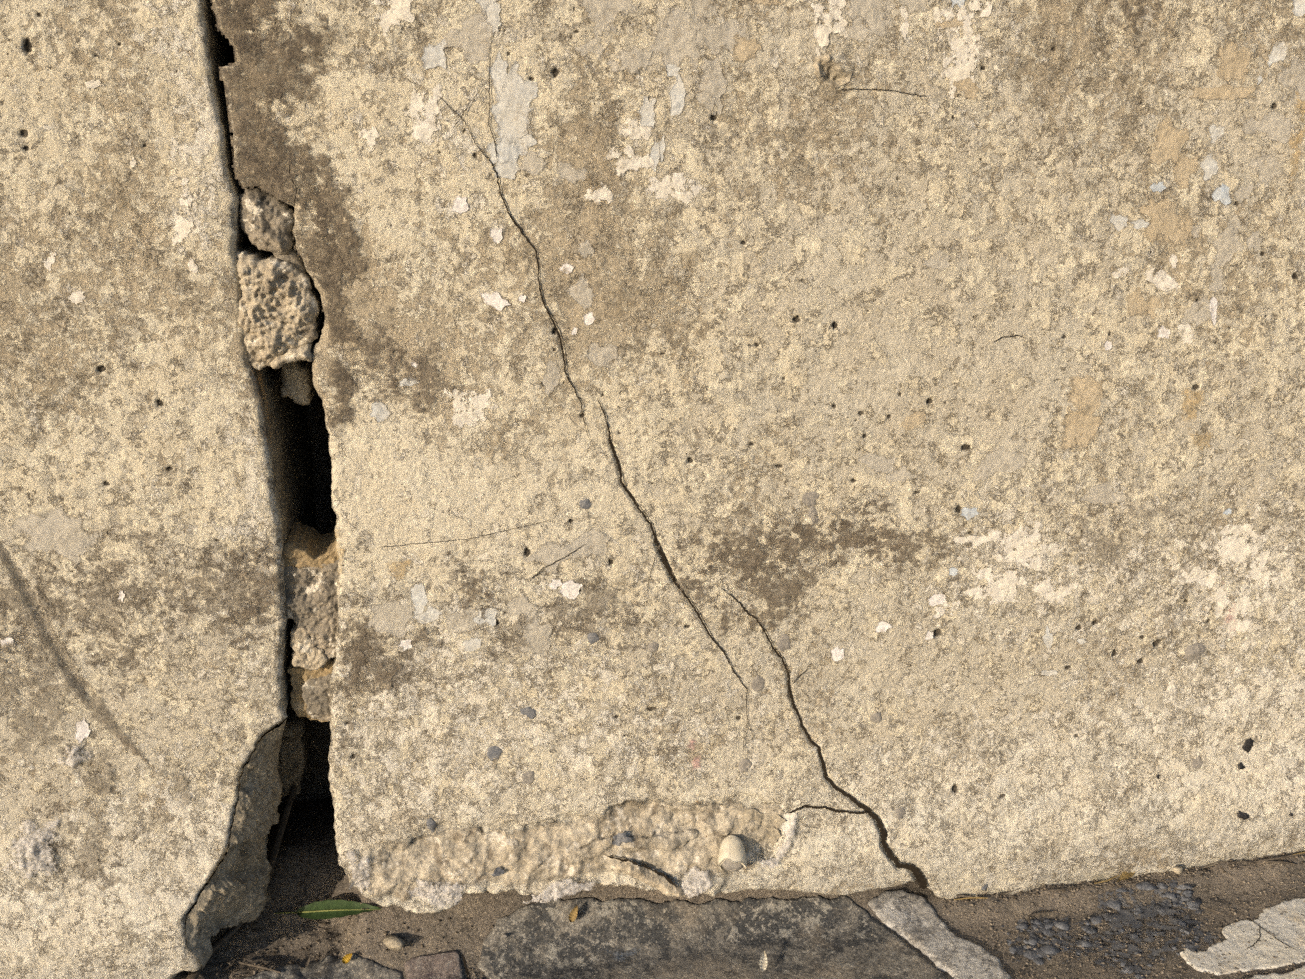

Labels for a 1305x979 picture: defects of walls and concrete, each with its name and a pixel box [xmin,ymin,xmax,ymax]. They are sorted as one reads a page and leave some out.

peeling [409,38,447,146]
peeling [486,0,762,205]
crack [842,88,926,96]
peeling [803,0,992,102]
peeling [1109,115,1231,291]
crack [435,57,753,752]
crack [379,520,548,548]
peeling [290,622,331,722]
crack [718,585,941,890]
spalling [185,719,287,970]
spalling [346,799,797,909]
crack [605,855,676,887]